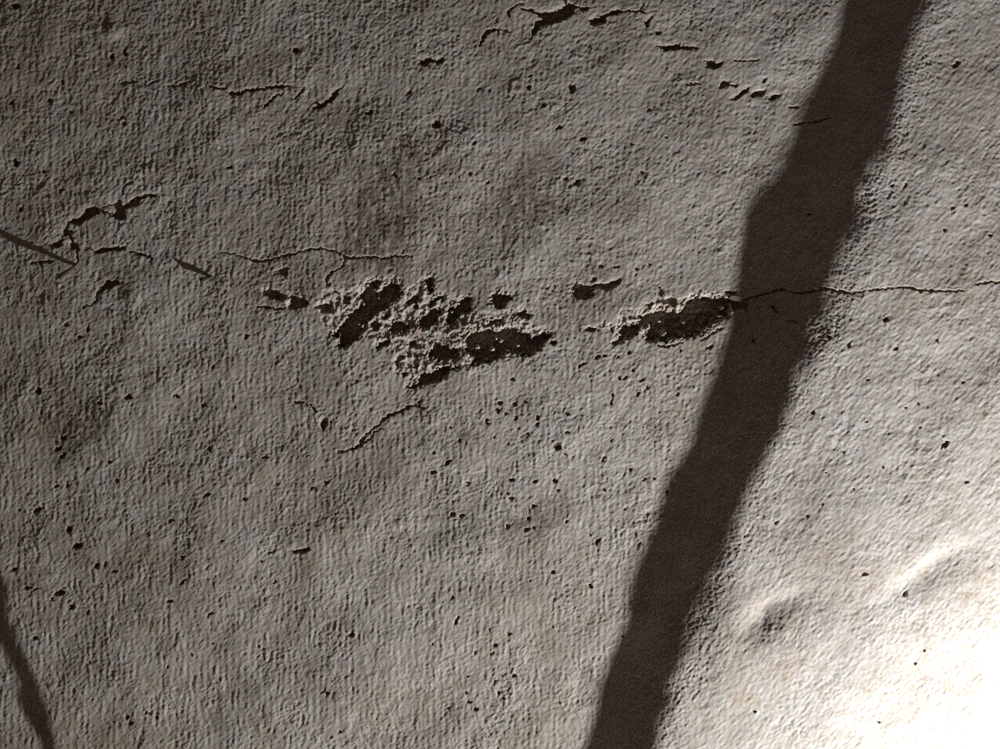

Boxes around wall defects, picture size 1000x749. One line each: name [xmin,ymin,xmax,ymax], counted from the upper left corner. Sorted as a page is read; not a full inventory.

crack [30,180,174,265]
crack [220,246,414,287]
flaking render [570,264,622,300]
crack [739,280,1000,323]
flaking render [257,274,557,389]
flaking render [578,286,749,378]
crack [293,400,425,454]